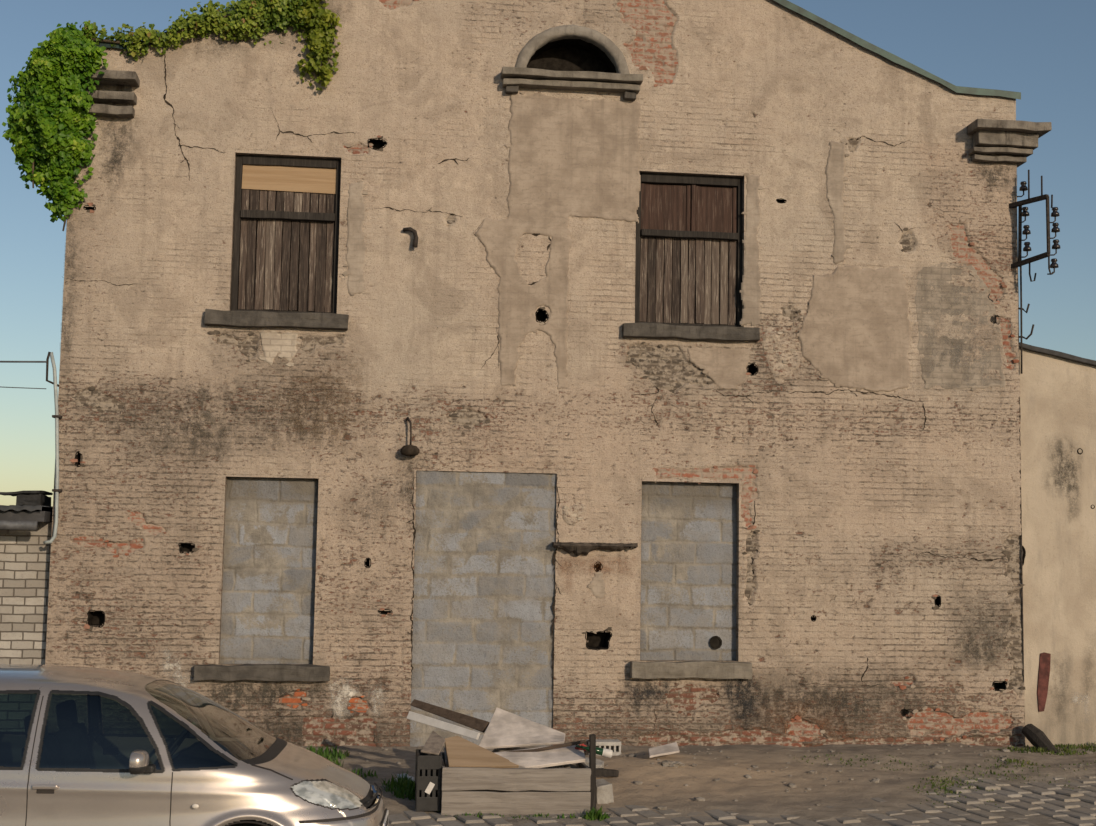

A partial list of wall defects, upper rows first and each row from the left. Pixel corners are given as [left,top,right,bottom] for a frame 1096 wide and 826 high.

spalling [379,0,419,10]
spalling [616,0,678,87]
crack [163,53,226,181]
crack [272,111,354,141]
flaking render [207,330,344,366]
spalling [626,342,759,394]
flaking render [915,262,1019,391]
spalling [275,689,377,747]
spalling [665,684,723,716]
spalling [639,706,1024,747]